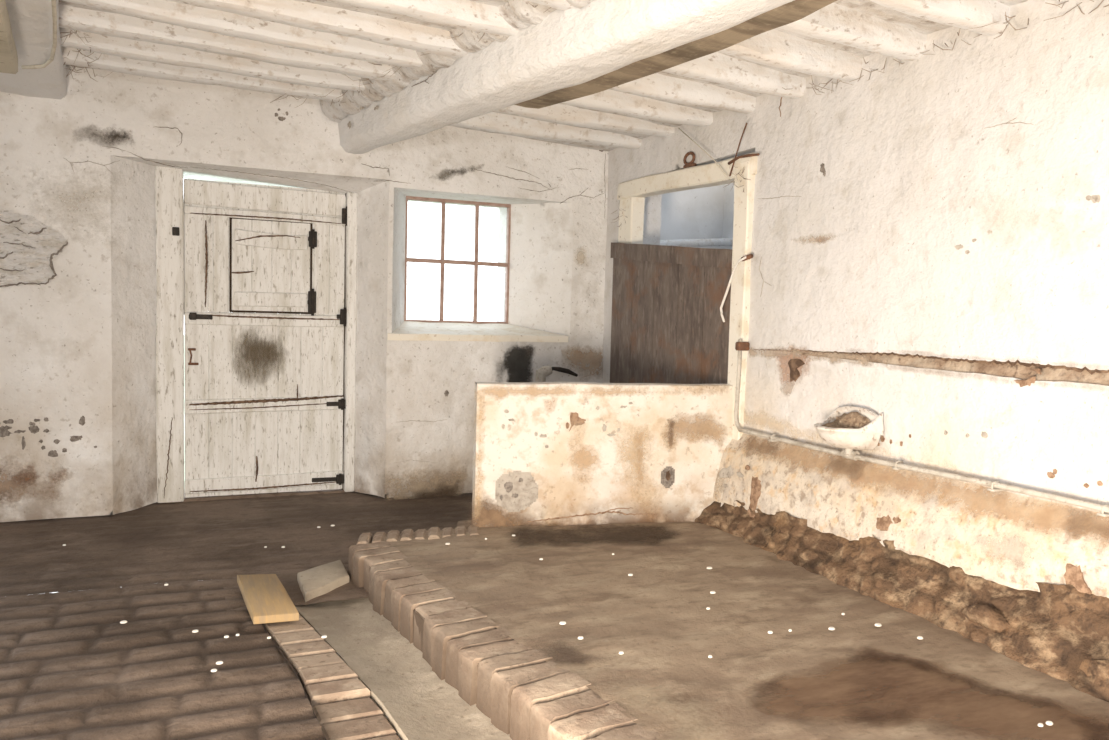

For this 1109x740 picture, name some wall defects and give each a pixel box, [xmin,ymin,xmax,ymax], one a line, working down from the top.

water stain [89,133,125,144]
flaking render [0,210,68,288]
flaking render [754,349,1109,387]
peeling [0,416,85,457]
flaking render [495,471,538,512]
flaking render [695,465,1109,702]